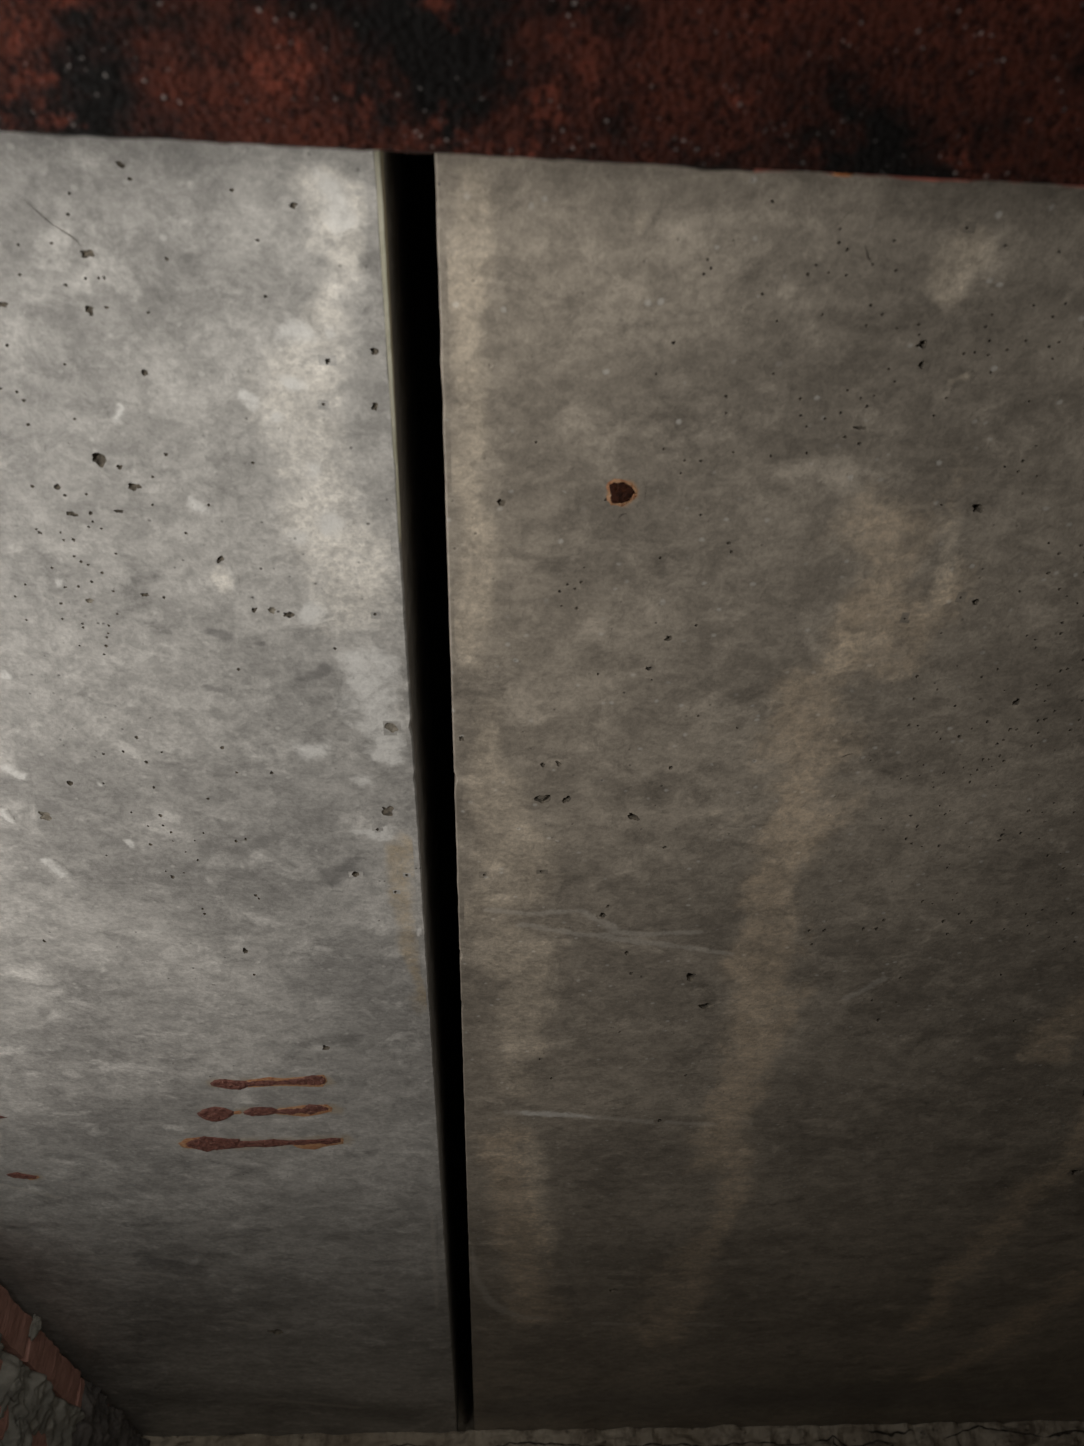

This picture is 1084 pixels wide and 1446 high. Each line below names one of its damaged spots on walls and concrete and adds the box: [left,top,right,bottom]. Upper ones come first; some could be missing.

rust [597,472,647,512]
rust [172,1071,359,1155]
crack [502,1425,1084,1446]